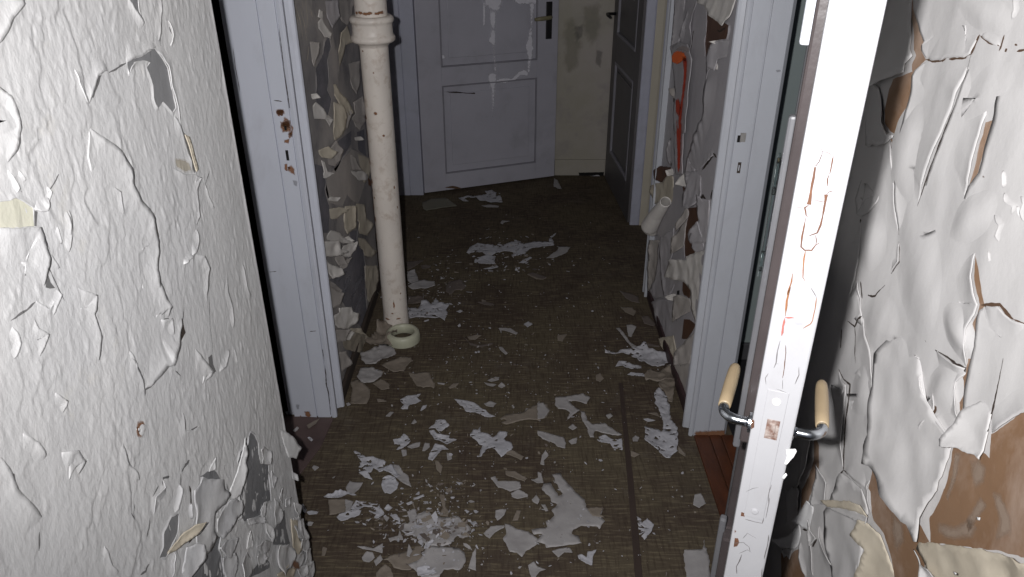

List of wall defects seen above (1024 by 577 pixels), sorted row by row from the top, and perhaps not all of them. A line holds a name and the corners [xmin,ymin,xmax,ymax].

peeling [0,0,25,42]
flaking render [0,87,73,359]
peeling [78,288,103,360]
peeling [87,128,186,394]
rust [136,422,147,438]
peeling [74,0,214,313]
peeling [195,328,238,383]
rust [276,109,293,143]
peeling [147,405,457,577]
peeling [295,0,397,417]
peeling [605,0,736,458]
peeling [771,0,1024,577]